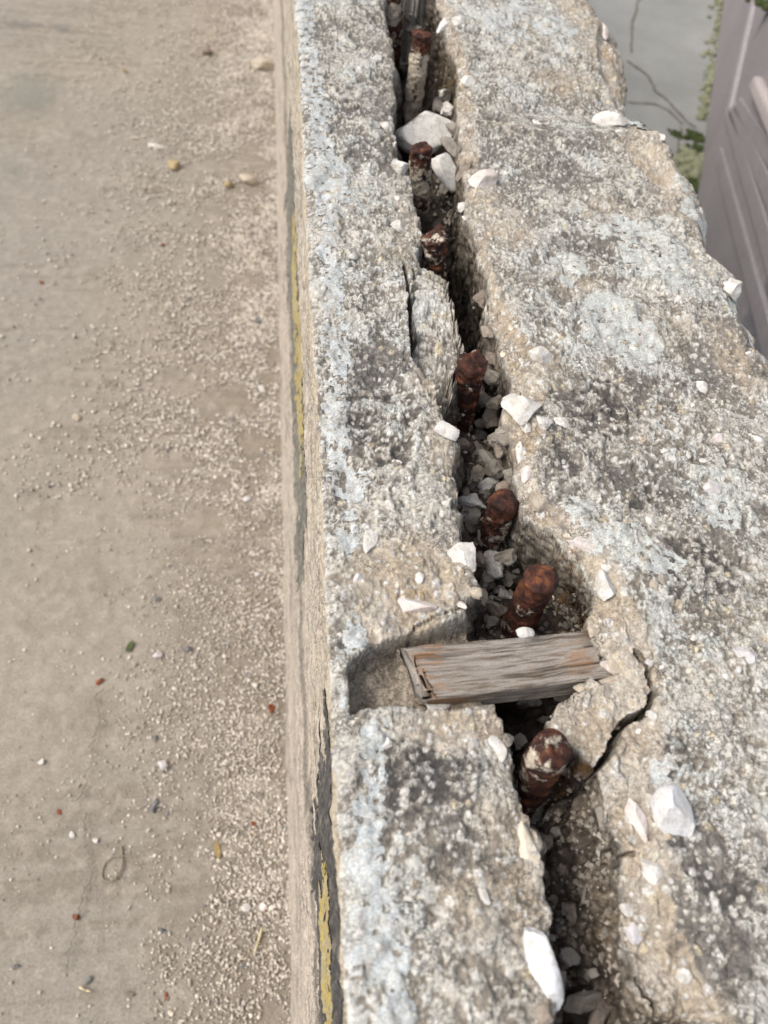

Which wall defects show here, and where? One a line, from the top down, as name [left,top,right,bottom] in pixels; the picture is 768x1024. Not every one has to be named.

peeling [485,0,579,45]
peeling [547,250,590,289]
peeling [593,213,693,293]
spalling [284,0,468,655]
crack [394,0,598,650]
spalling [454,349,488,435]
spalling [473,488,519,553]
spalling [500,564,558,639]
peeling [309,678,504,1024]
crack [488,648,691,1024]